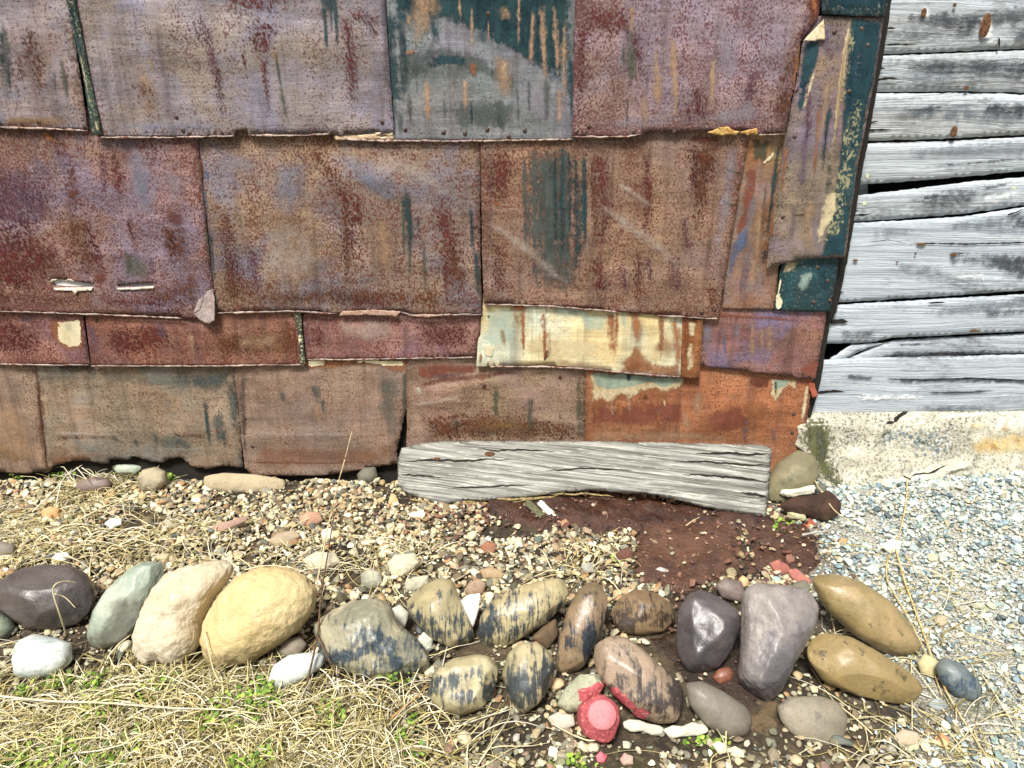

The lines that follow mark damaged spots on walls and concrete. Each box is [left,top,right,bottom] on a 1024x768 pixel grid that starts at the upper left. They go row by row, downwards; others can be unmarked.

corrosion [192,15,226,110]
corrosion [225,0,286,113]
corrosion [340,9,379,106]
corrosion [504,0,757,125]
peeling [803,20,825,41]
corrosion [0,118,106,307]
corrosion [106,212,206,311]
corrosion [217,153,472,310]
corrosion [588,146,695,375]
corrosion [669,137,720,289]
corrosion [92,324,173,355]
corrosion [593,396,701,440]